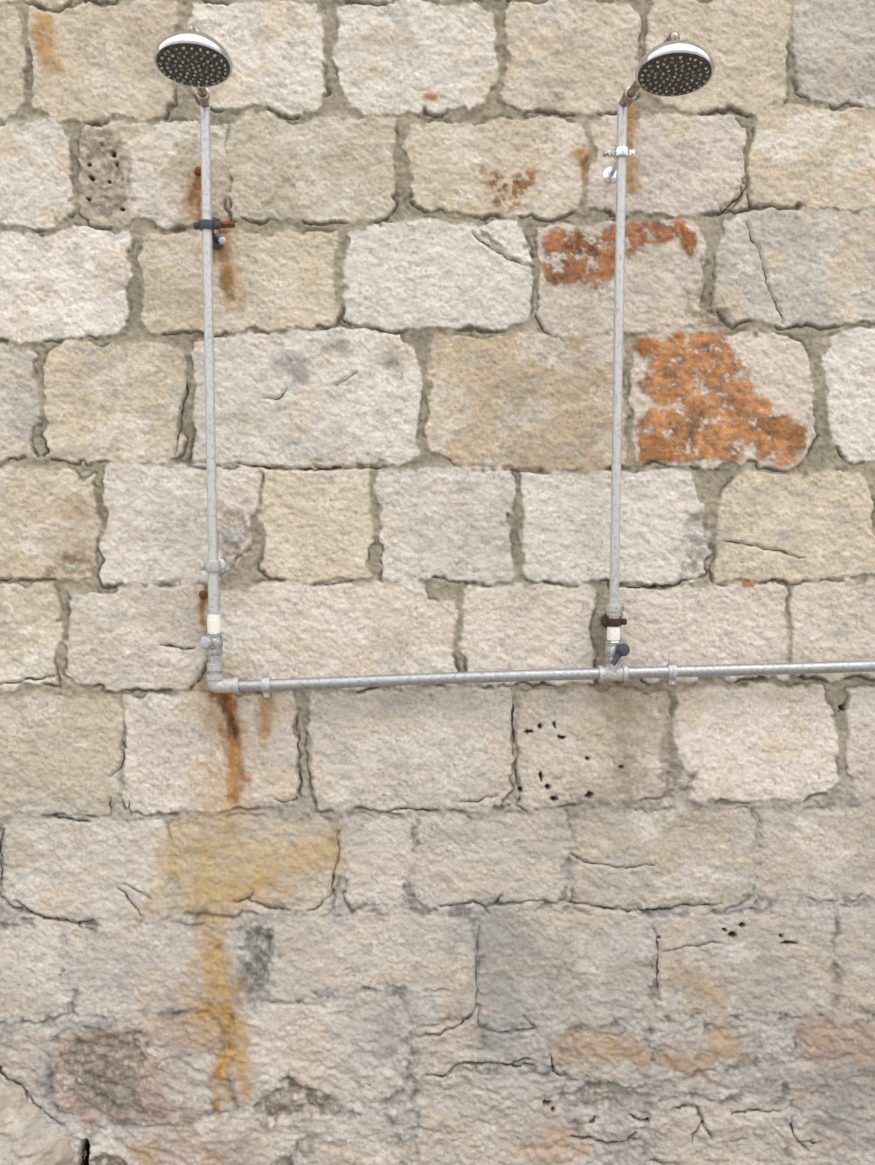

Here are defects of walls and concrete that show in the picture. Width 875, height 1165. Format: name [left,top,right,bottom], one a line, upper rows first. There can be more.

corrosion [211,693,250,801]
crack [567,901,713,913]
crack [427,896,562,1078]
crack [656,941,717,987]
crack [572,1114,642,1143]
crack [676,1104,817,1148]